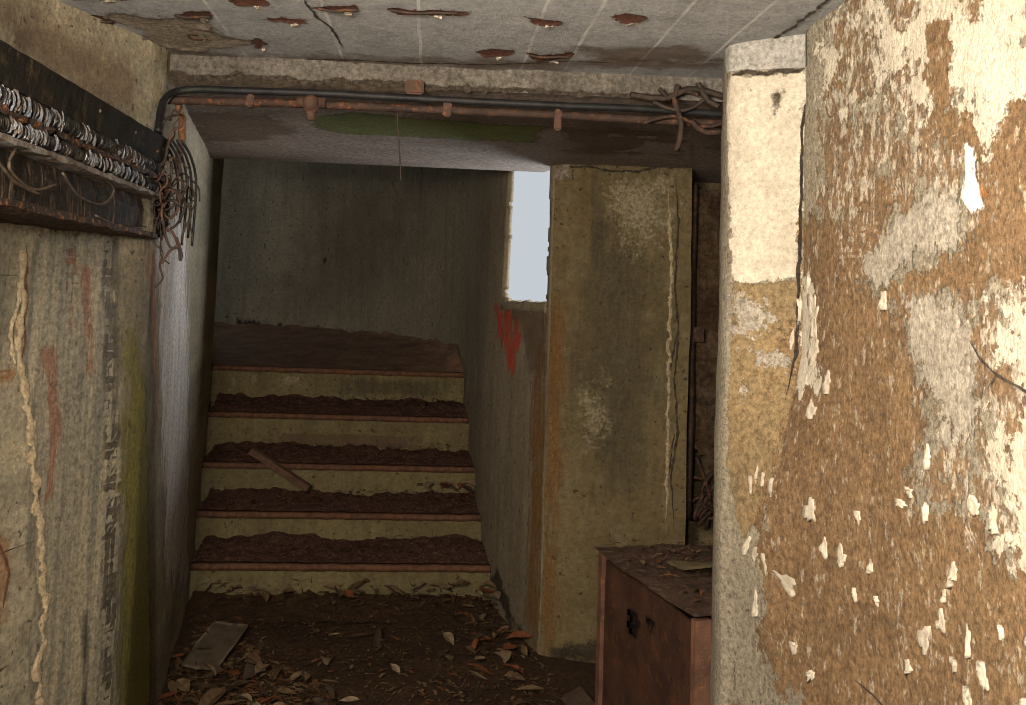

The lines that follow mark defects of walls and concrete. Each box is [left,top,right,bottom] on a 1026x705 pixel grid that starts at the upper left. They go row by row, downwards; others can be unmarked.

crack [565,165,680,530]
crack [785,103,806,400]
flaking render [725,0,1026,705]
crack [968,338,1026,394]